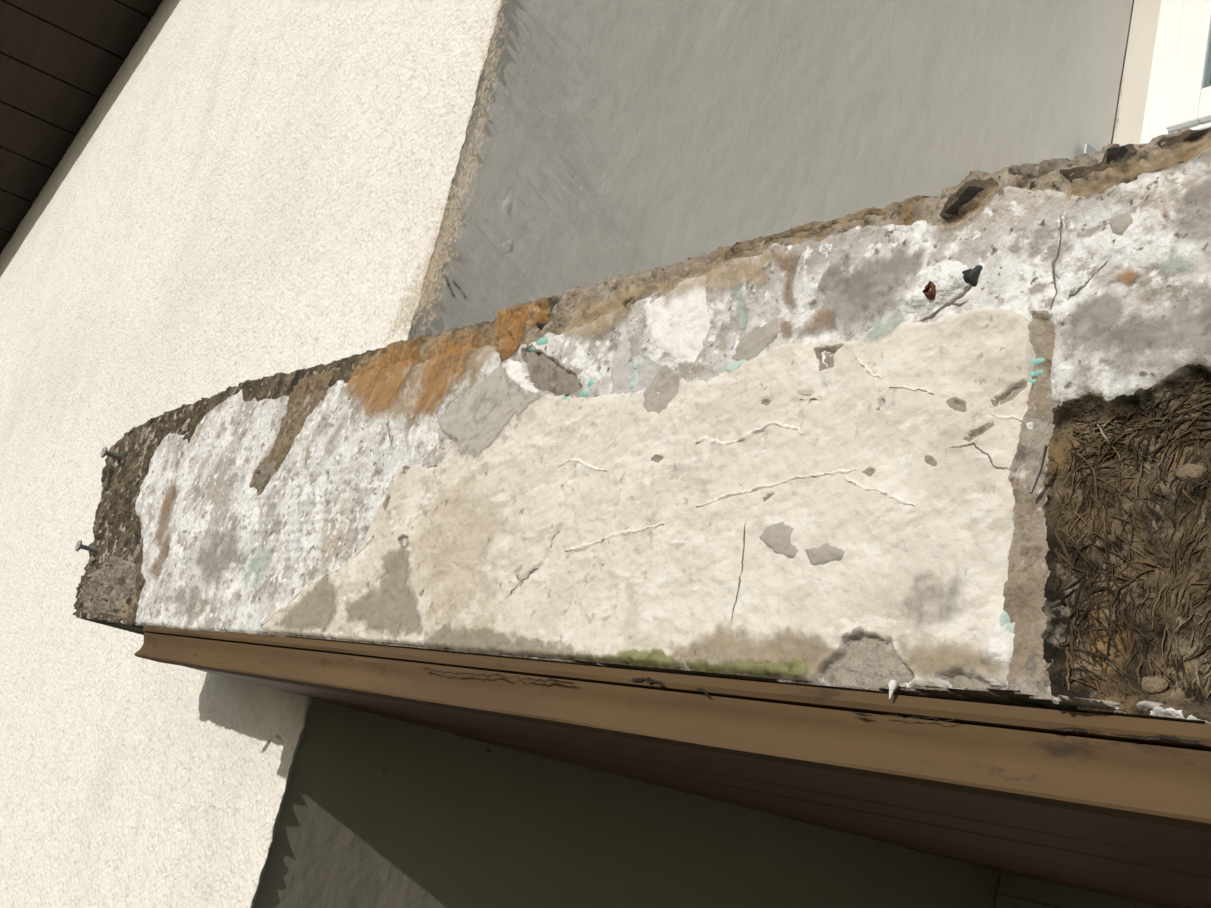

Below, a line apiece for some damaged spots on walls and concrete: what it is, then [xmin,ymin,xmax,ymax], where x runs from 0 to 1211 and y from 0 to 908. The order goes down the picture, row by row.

rust [495,301,548,356]
rust [347,335,474,413]
spalling [73,127,1211,624]
crack [949,442,1013,471]
crack [508,529,562,598]
crack [731,523,746,622]
flaking render [815,626,914,689]